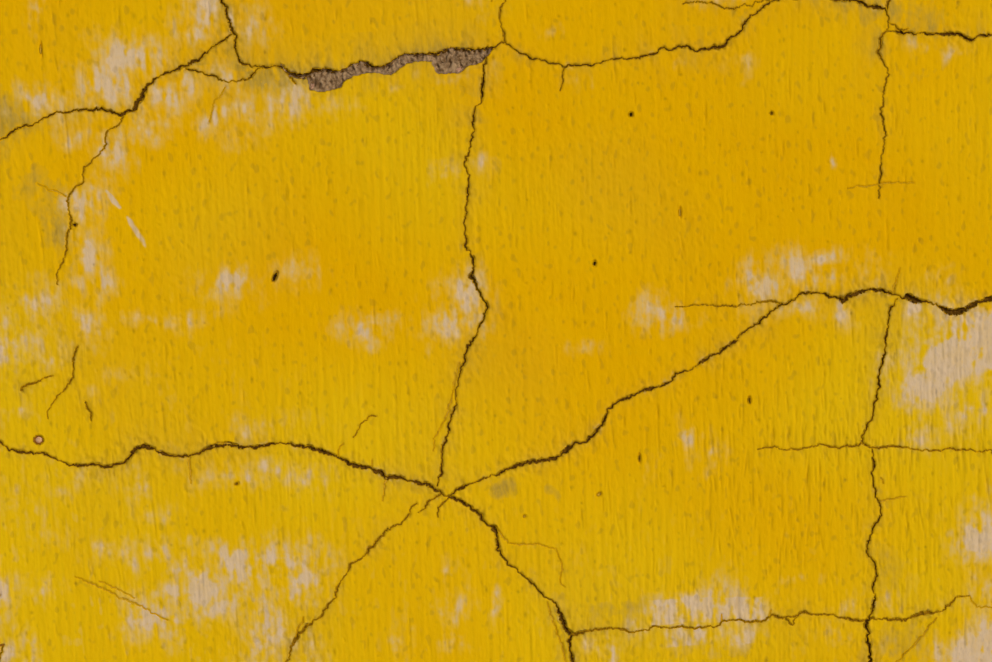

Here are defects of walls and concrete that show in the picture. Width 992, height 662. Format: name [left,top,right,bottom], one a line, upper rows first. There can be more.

crack [0,0,296,285]
peeling [0,0,504,421]
crack [432,57,489,486]
crack [491,0,780,91]
crack [831,0,992,199]
peeling [0,405,348,662]
peeling [376,551,506,662]
crack [0,268,992,662]